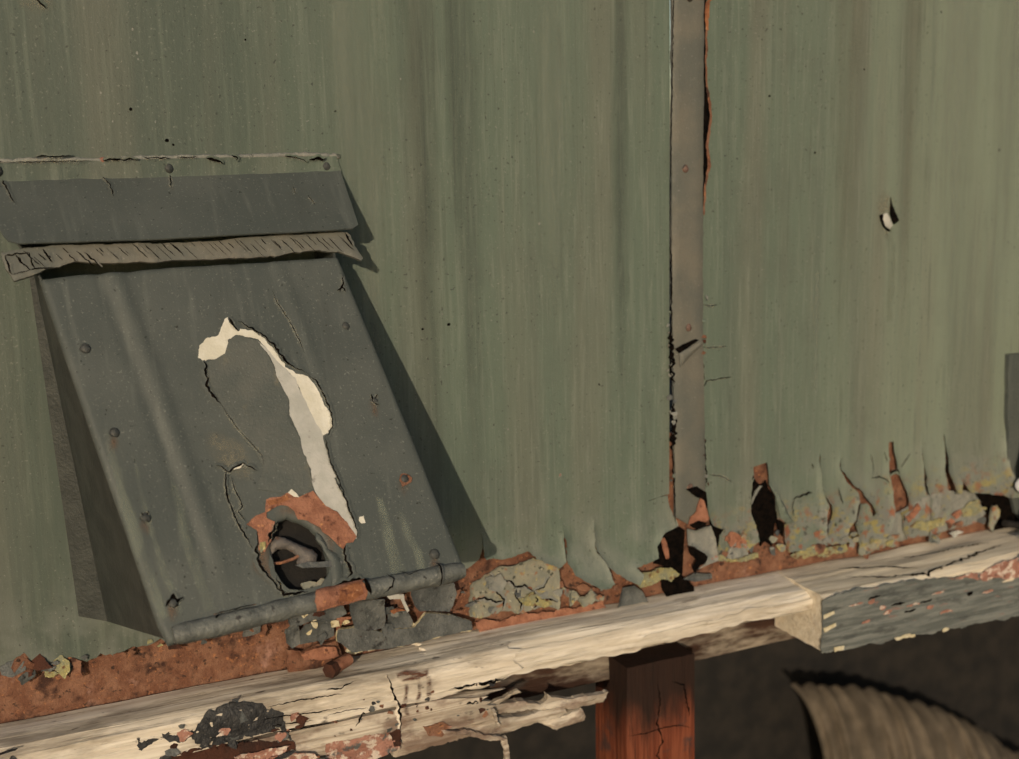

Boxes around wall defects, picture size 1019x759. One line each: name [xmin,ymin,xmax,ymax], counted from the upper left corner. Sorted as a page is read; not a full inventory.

corrosion [703,0,712,215]
peeling [198,317,365,552]
peeling [284,419,1019,654]
peeling [164,590,183,607]
corrosion [315,578,368,612]
peeling [0,653,88,685]
corrosion [285,639,342,672]
crack [632,681,690,759]